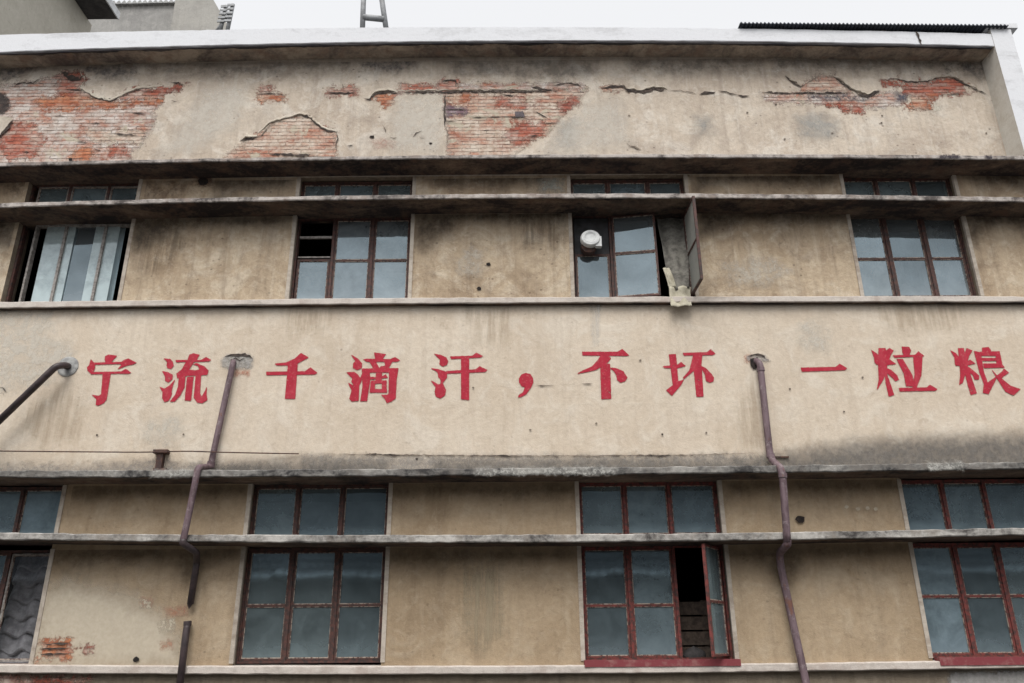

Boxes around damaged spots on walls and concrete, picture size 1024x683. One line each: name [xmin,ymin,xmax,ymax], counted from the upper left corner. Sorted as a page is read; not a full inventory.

flaking render [0,70,189,163]
flaking render [254,85,288,105]
flaking render [223,111,338,158]
flaking render [324,78,589,155]
crack [600,84,747,97]
flaking render [762,74,986,123]
peeling [0,582,179,683]